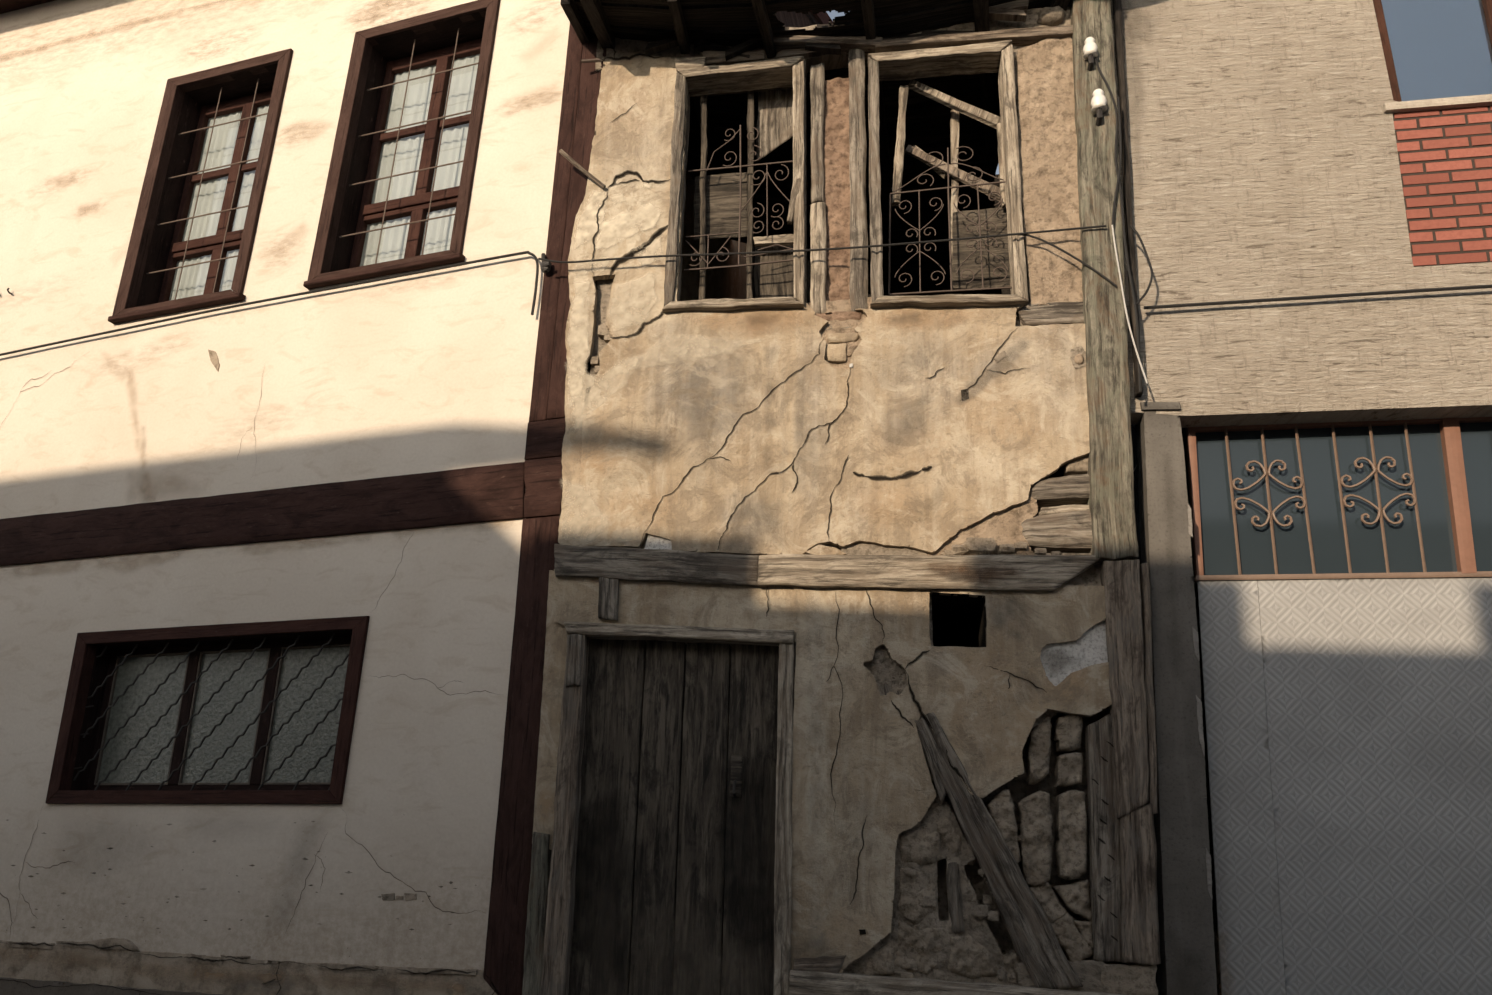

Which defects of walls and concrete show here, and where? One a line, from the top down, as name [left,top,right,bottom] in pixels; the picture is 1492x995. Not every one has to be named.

crack [591,170,670,279]
crack [610,311,663,339]
crack [928,326,1023,401]
crack [640,330,932,549]
flaking render [806,455,1093,556]
flaking render [864,645,907,696]
flaking render [1040,621,1108,686]
crack [826,588,971,904]
crack [138,807,484,994]
flaking render [793,708,1158,995]
flaking render [182,955,251,965]
flaking render [316,963,479,975]